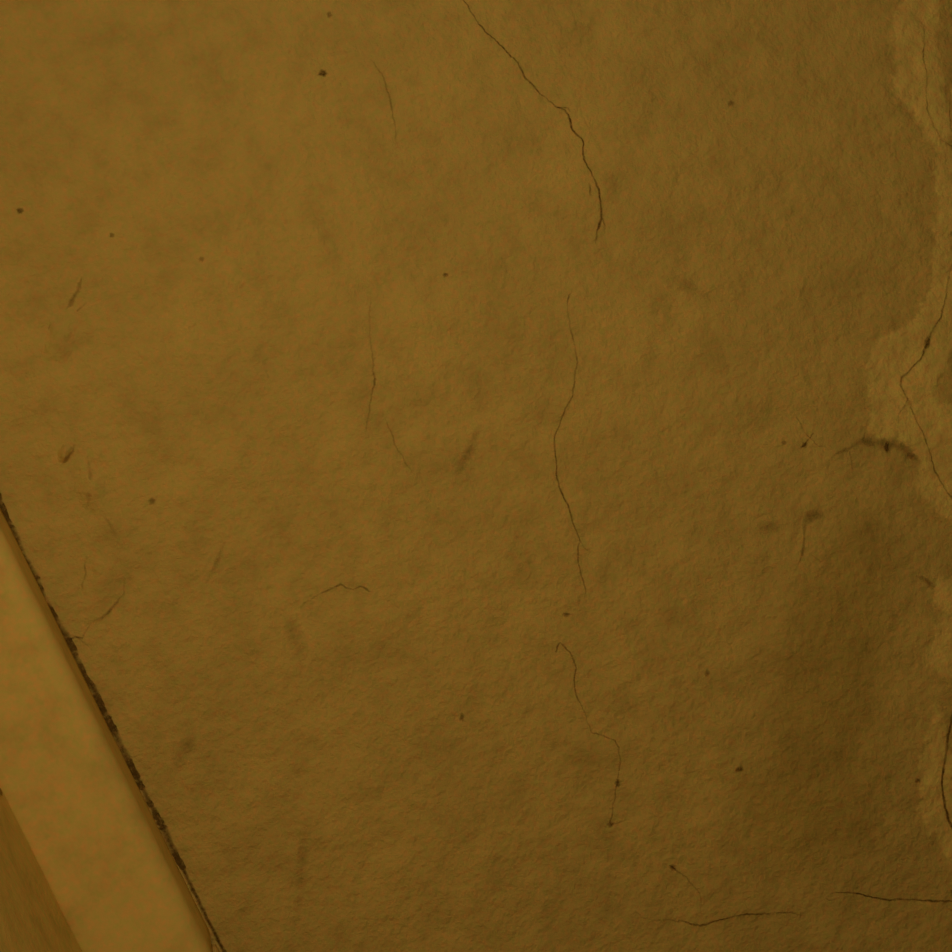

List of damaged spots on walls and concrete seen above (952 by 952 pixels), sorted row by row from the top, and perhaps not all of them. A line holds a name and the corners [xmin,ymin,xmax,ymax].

crack [558,107,602,230]
crack [0,493,225,952]
crack [941,717,952,827]
crack [855,893,950,902]